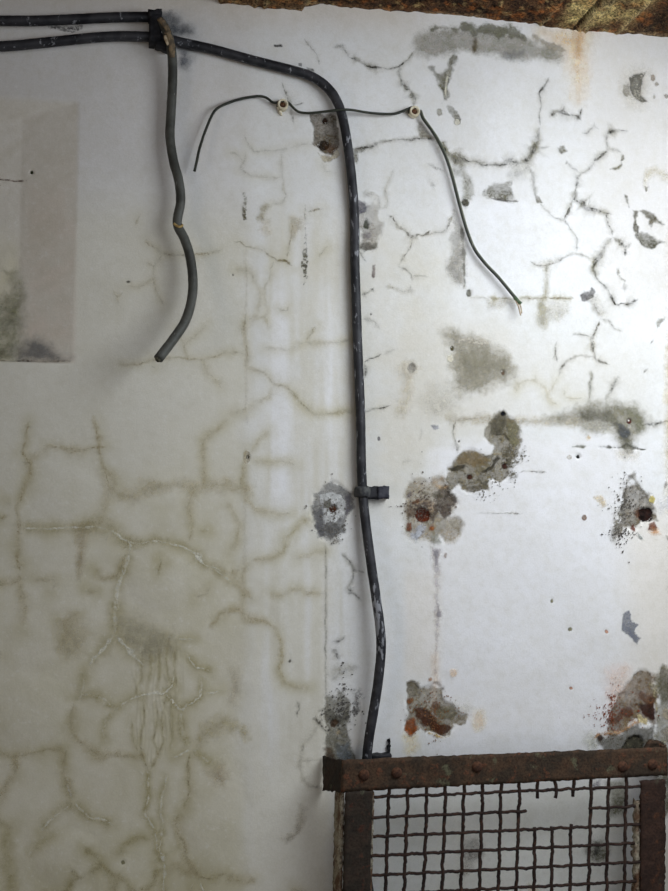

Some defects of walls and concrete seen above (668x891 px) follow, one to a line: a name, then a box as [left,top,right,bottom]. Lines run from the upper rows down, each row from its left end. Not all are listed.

crack [339,46,416,99]
crack [357,87,636,389]
leakage [0,283,57,359]
leakage [447,331,511,391]
leakage [557,404,643,445]
spalling [304,473,356,544]
spalling [390,411,529,543]
spalling [601,472,668,553]
spalling [321,662,366,760]
spalling [400,678,467,744]
spalling [584,671,659,749]
leakage [654,666,668,787]